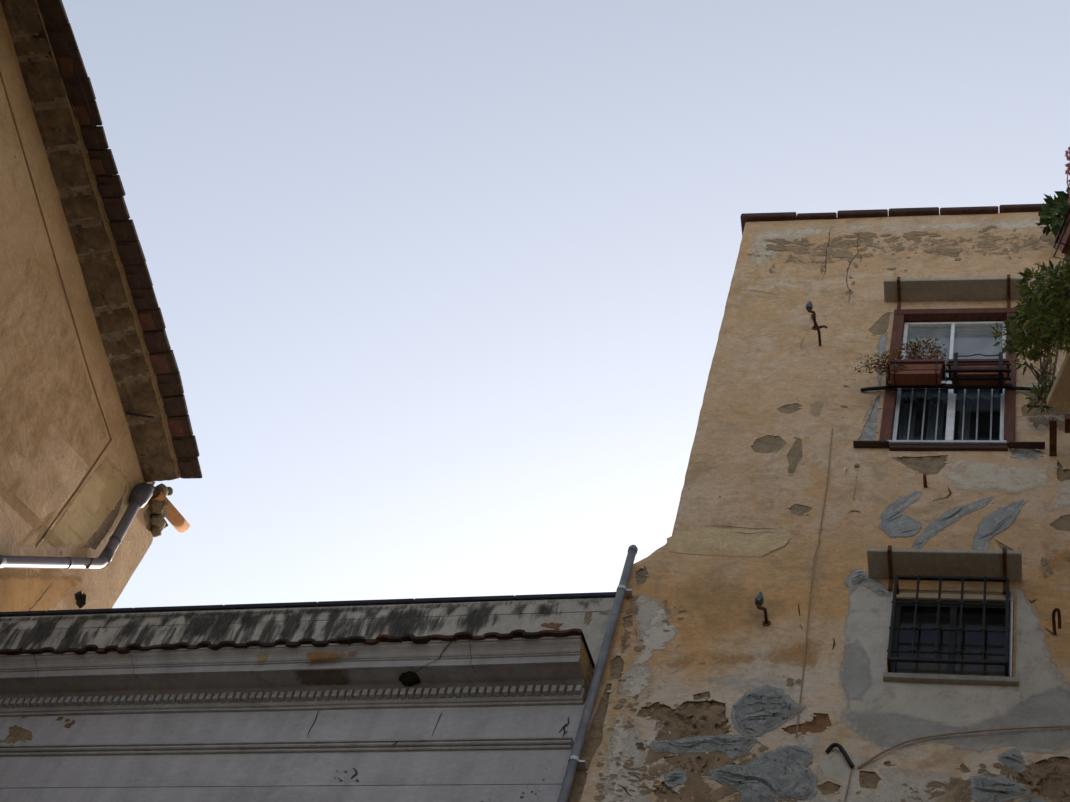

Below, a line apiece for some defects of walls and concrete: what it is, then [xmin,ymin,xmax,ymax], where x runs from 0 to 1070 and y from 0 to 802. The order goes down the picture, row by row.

peeling [748,225,1058,299]
spalling [777,403,802,414]
spalling [747,434,803,476]
spalling [786,504,812,516]
spalling [1049,514,1070,532]
water stain [0,576,497,650]
water stain [515,600,553,614]
spalling [568,566,769,802]
peeling [0,716,33,745]
spalling [781,713,832,736]
spalling [817,756,1070,802]